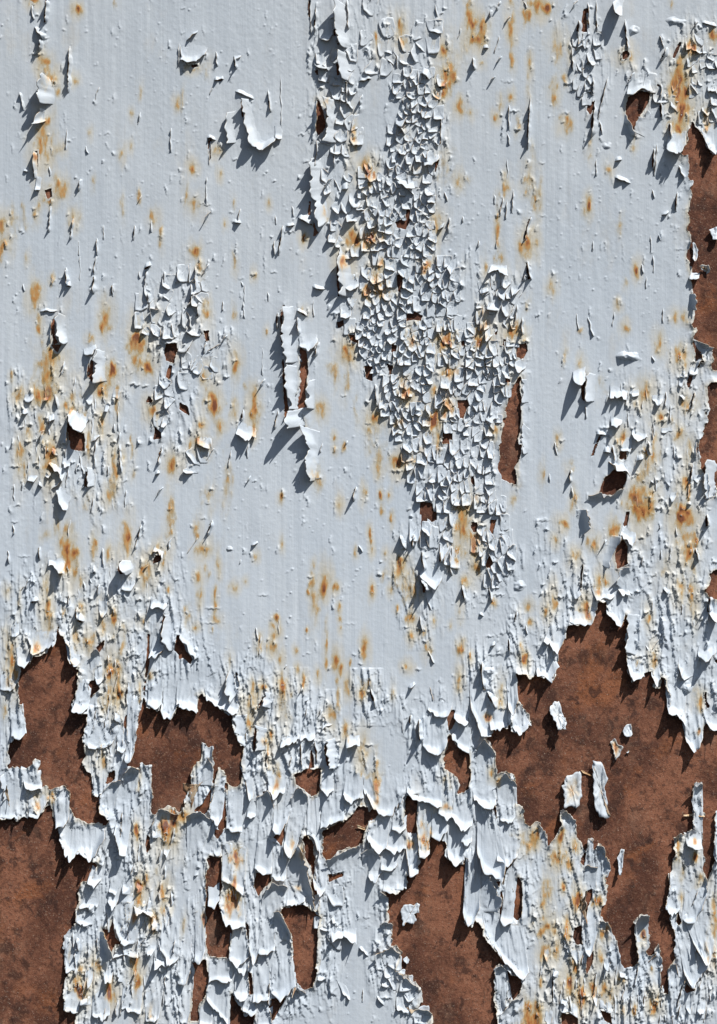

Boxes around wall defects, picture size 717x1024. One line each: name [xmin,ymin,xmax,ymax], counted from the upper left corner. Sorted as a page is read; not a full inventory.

crack [508,96,532,151]
peeling [624,20,717,178]
rust [668,40,717,488]
peeling [274,284,326,481]
peeling [569,340,717,538]
peeling [535,526,717,753]
rust [0,600,117,1024]
rust [127,688,244,844]
peeling [0,621,717,1024]
rust [487,576,717,1015]
rust [190,850,241,1021]
rust [385,823,542,1024]